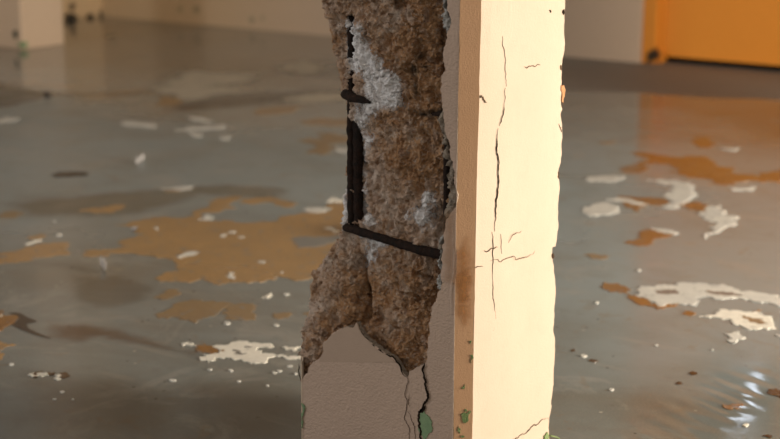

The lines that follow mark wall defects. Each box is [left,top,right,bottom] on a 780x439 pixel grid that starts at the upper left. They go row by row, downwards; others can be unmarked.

spalling [79,0,456,375]
water stain [345,18,404,226]
crack [476,36,534,318]
peeling [619,137,780,186]
crack [362,333,429,439]
peeling [600,282,696,317]